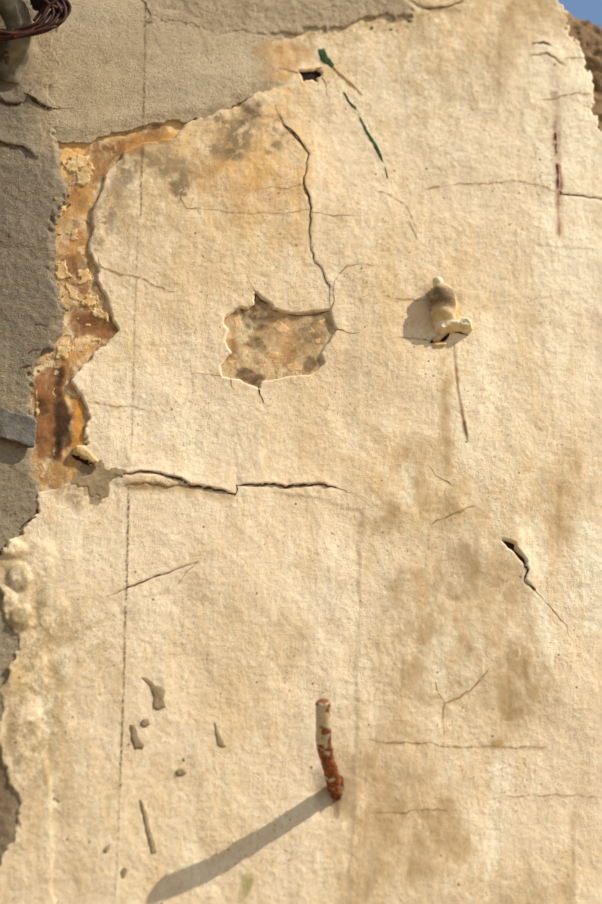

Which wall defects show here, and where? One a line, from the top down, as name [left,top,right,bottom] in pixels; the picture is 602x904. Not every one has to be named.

spalling [0,92,68,109]
crack [180,104,370,307]
crack [427,181,602,200]
peeling [21,124,169,492]
crack [98,259,174,292]
flaking render [201,275,360,403]
crack [125,471,373,508]
crack [503,541,569,635]
corrosion [315,698,344,800]